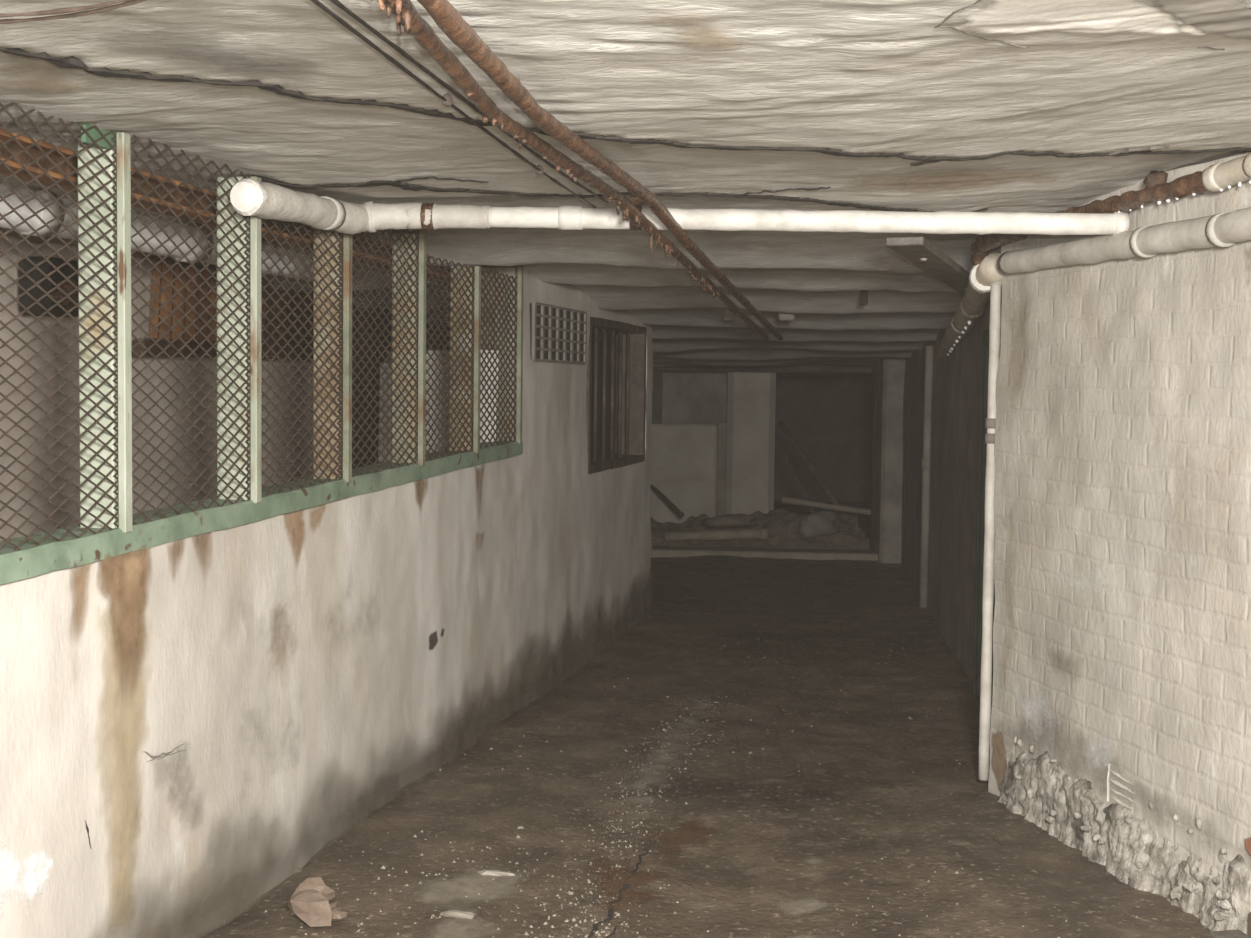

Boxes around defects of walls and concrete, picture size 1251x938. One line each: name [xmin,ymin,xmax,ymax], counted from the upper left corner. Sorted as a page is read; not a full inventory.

corrosion [372,0,412,36]
spalling [935,0,1225,50]
water stain [1155,0,1251,39]
crack [0,47,495,126]
crack [528,128,1251,166]
crack [263,176,927,212]
corrosion [172,535,208,558]
corrosion [285,505,325,550]
corrosion [74,548,150,664]
spalling [992,733,1251,935]
water stain [0,848,53,913]
crack [588,840,652,938]